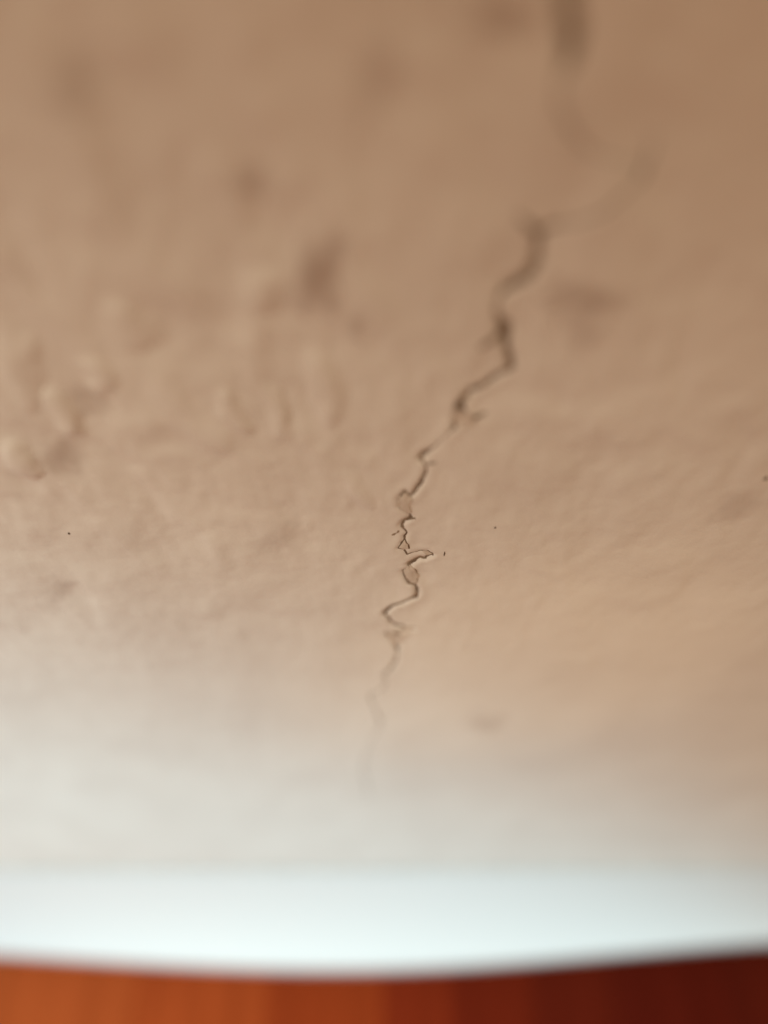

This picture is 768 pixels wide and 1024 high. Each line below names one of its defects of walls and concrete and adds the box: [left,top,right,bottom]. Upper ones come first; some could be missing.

crack [362,0,655,795]